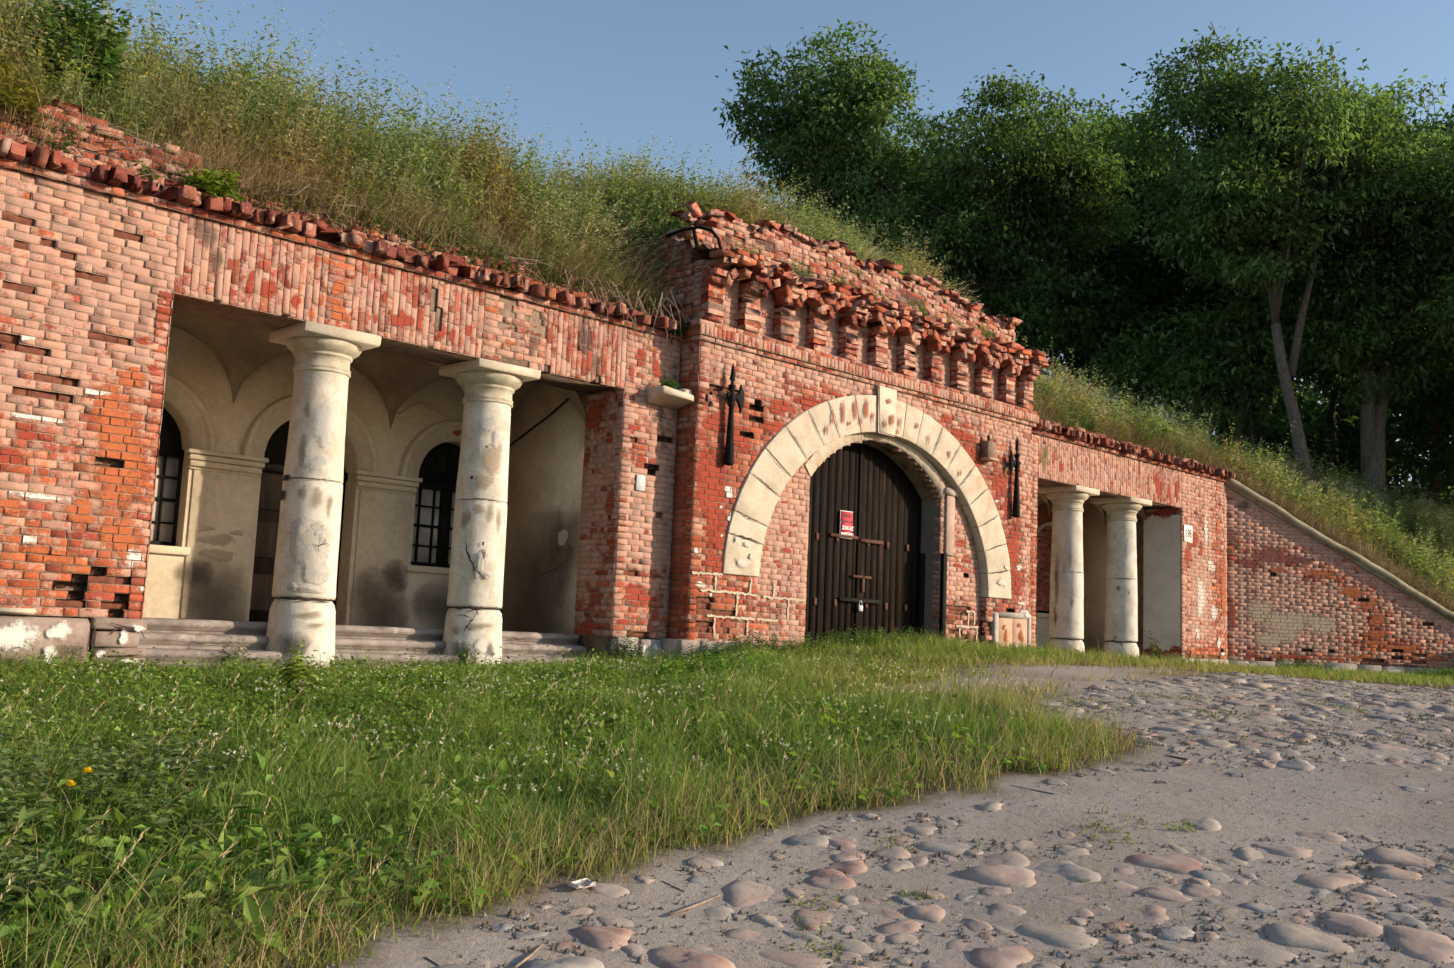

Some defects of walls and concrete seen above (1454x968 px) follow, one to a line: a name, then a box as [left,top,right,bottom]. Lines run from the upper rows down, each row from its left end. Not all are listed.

peeling [0,332,161,669]
water stain [179,566,233,621]
water stain [360,567,403,627]
crack [446,539,502,631]